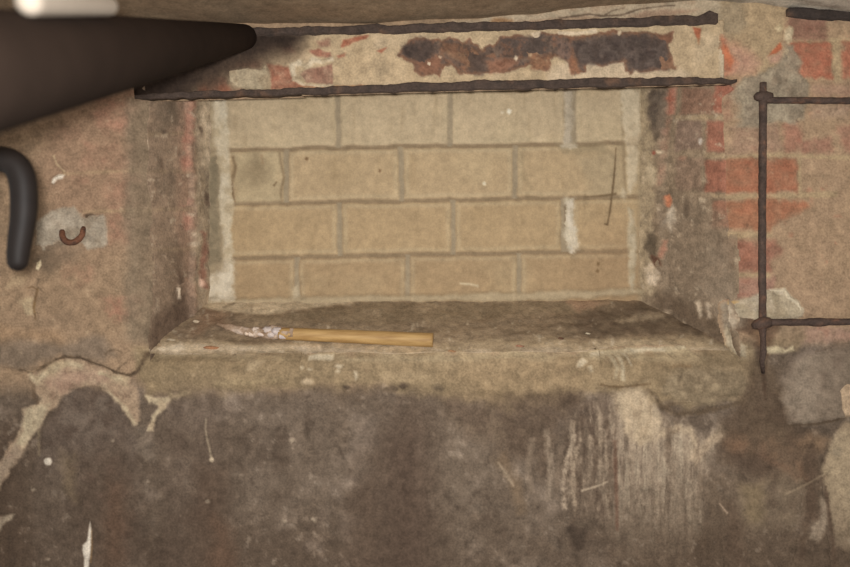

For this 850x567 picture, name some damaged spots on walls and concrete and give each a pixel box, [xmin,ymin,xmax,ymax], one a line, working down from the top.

rust [622,6,702,18]
rust [395,15,678,79]
flaking render [718,34,783,79]
spalling [641,86,692,290]
crack [18,344,162,404]
damp [22,223,360,567]
damp [327,234,839,567]
rust [736,317,781,367]